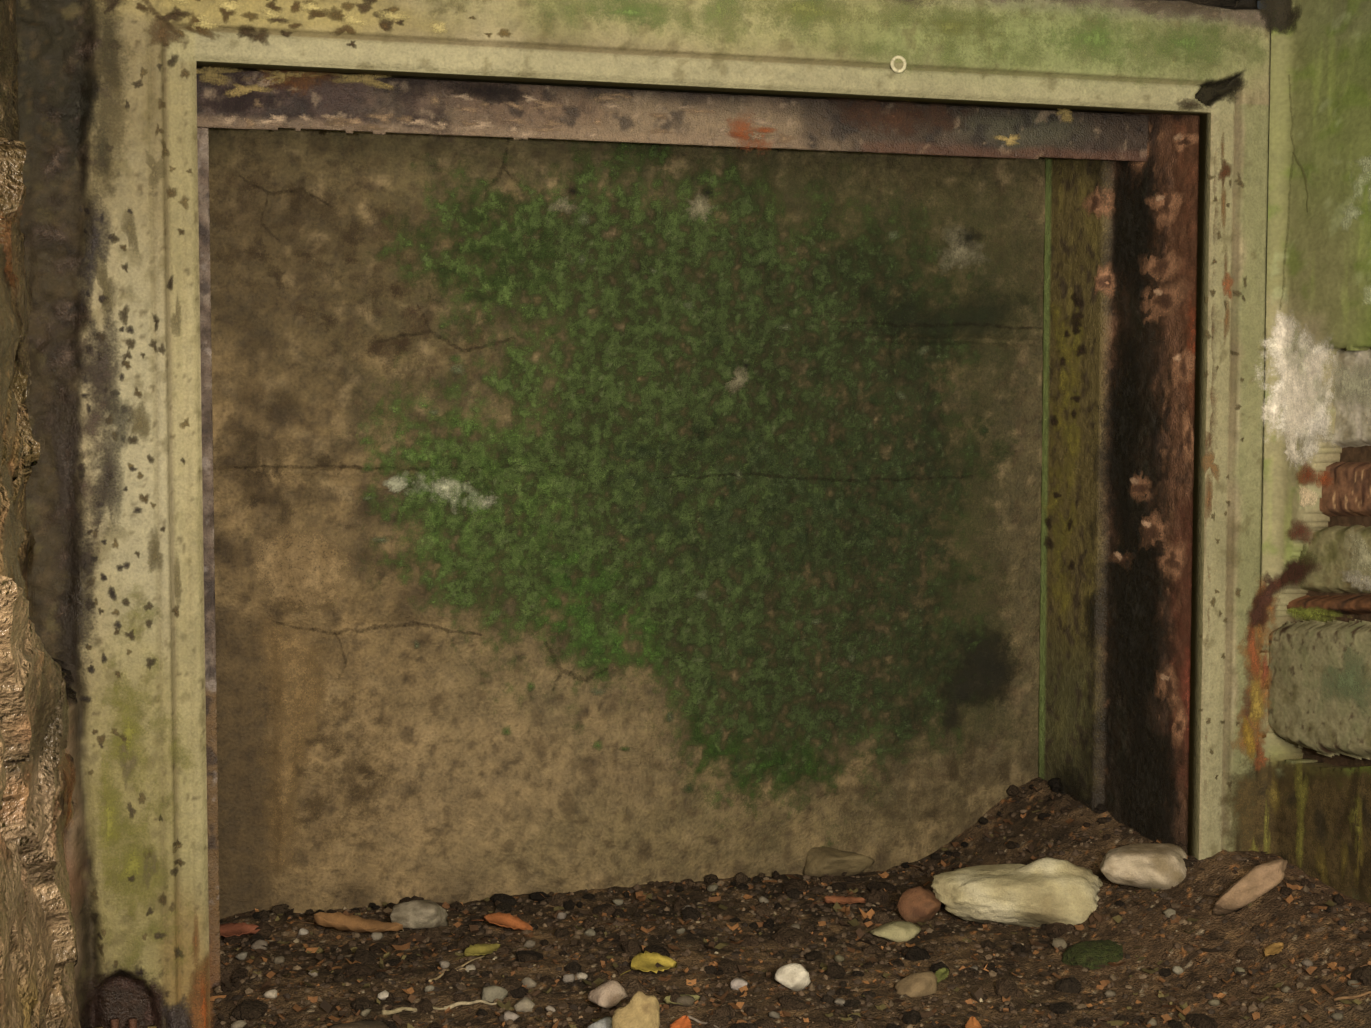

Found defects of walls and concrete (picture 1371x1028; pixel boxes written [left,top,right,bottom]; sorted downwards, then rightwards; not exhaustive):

peeling [125,0,560,138]
damp [1343,157,1371,228]
peeling [96,213,180,370]
peeling [86,579,153,655]
peeling [128,455,156,507]
peeling [135,527,181,617]
damp [387,476,490,506]
rust [1172,124,1233,775]
rust [1238,559,1321,769]
damp [1264,317,1334,464]
rust [1289,464,1318,541]
flaking render [1264,349,1371,767]